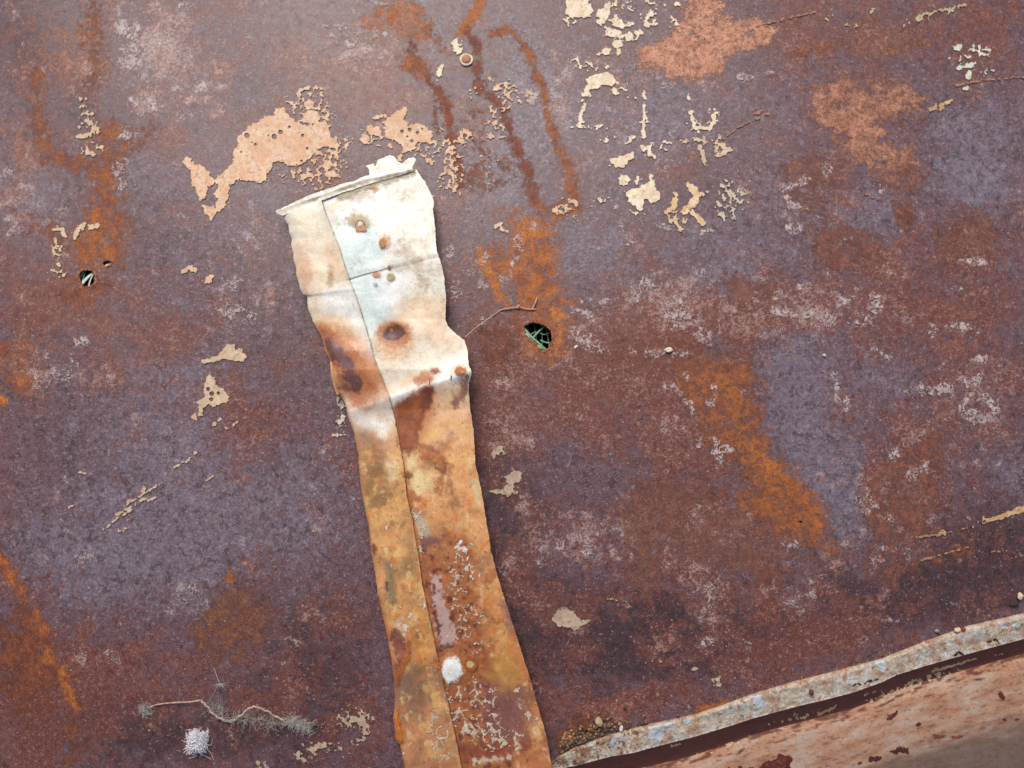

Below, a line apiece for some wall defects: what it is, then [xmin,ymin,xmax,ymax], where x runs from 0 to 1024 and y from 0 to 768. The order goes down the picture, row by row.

peeling [903,3,967,28]
peeling [948,44,997,90]
peeling [468,76,536,139]
peeling [562,0,751,232]
peeling [928,99,953,115]
peeling [182,85,473,221]
peeling [552,197,579,221]
peeling [191,344,247,426]
peeling [552,609,591,631]